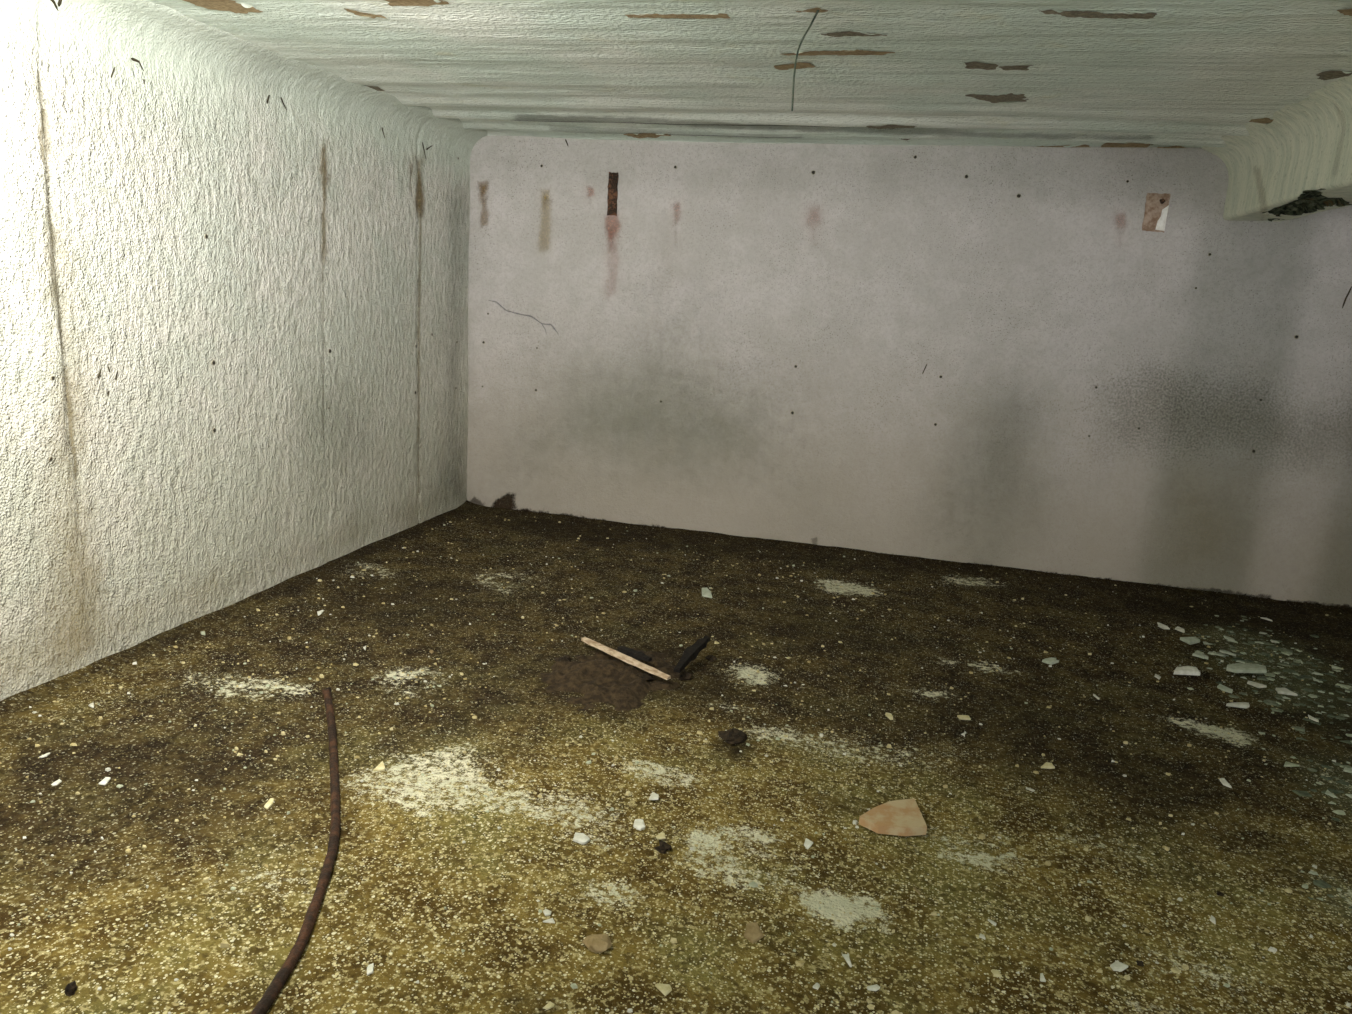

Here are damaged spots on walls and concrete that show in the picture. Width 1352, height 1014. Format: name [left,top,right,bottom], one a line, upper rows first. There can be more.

peeling [183,0,263,14]
peeling [344,0,449,18]
peeling [774,31,895,70]
spalling [1263,188,1352,221]
crack [489,300,557,332]